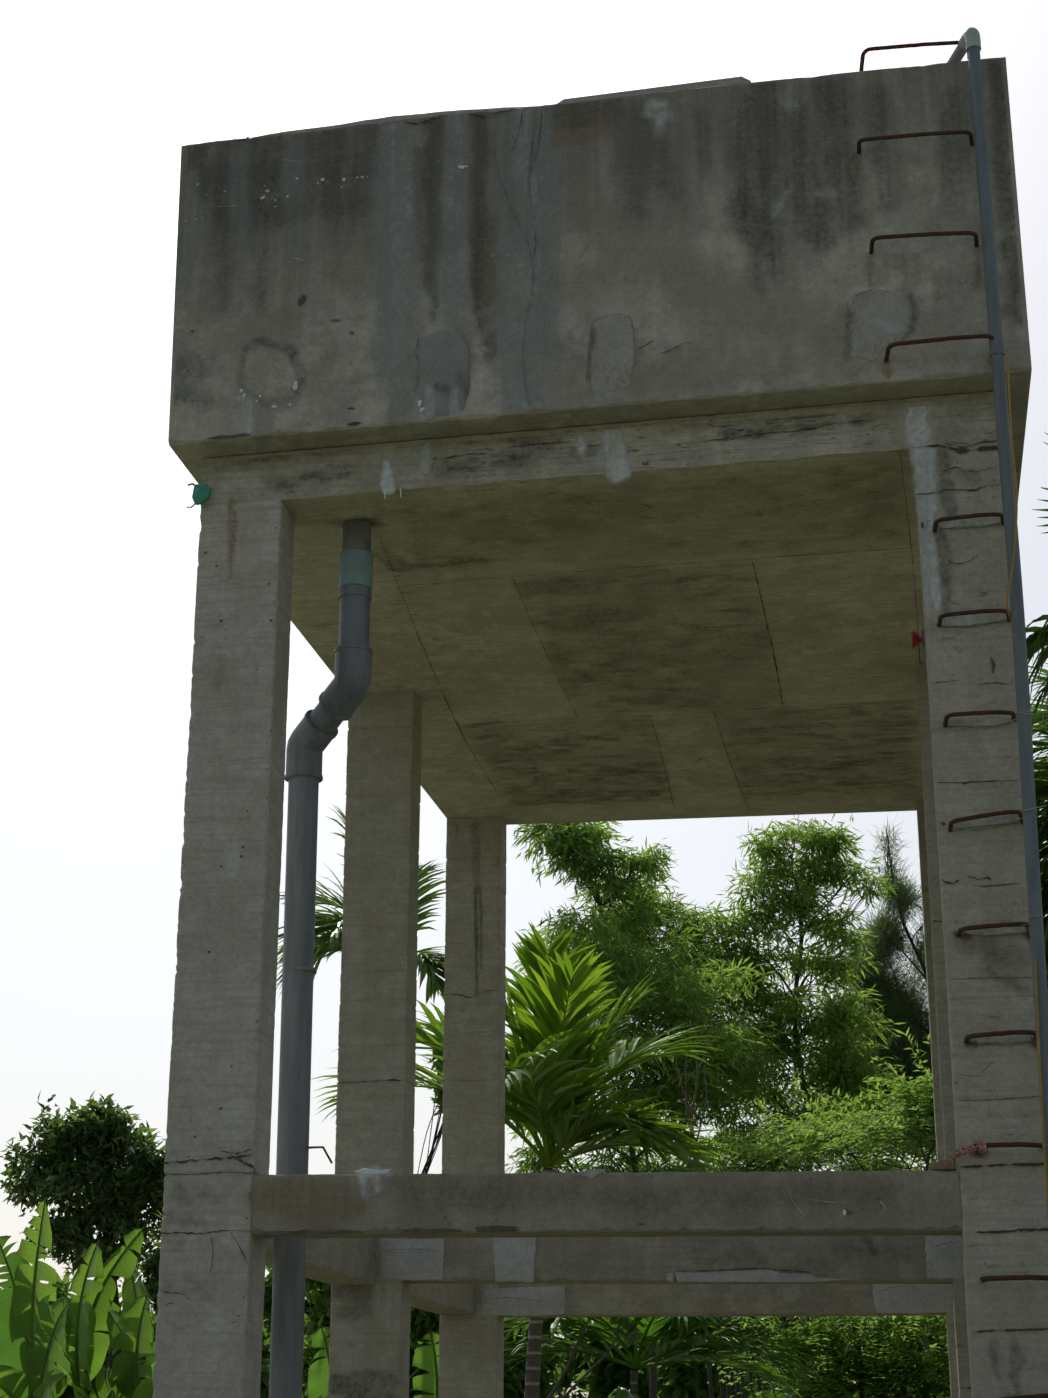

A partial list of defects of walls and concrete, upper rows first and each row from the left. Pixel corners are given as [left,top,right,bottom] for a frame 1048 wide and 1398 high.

damp [181,102,618,409]
crack [405,108,542,405]
crack [432,441,570,459]
damp [491,429,669,544]
crack [161,1149,255,1175]